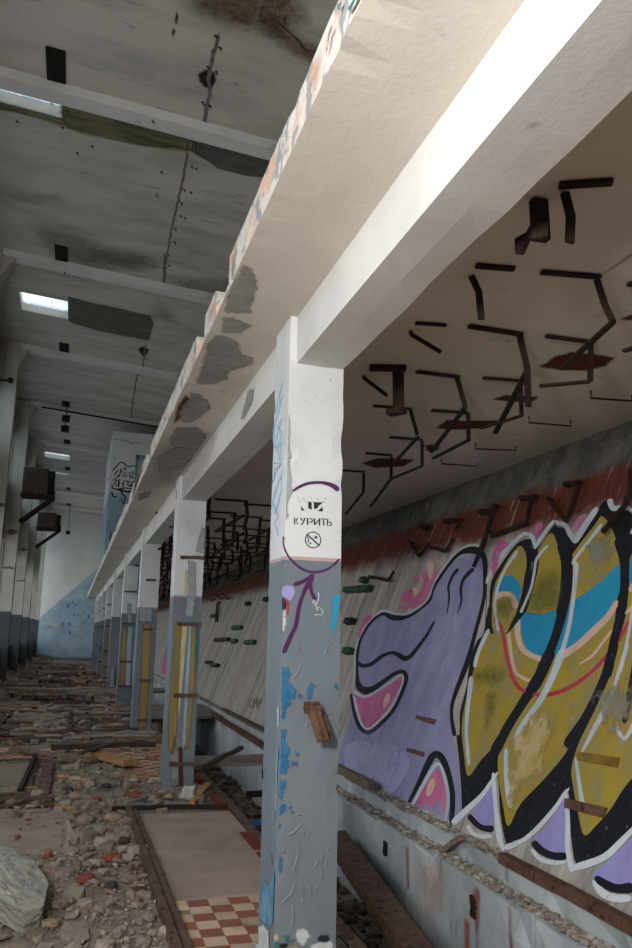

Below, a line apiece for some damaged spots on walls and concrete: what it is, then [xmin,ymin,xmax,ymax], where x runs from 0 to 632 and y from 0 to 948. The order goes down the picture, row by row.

crack [203,33,220,123]
crack [278,21,316,53]
crack [162,152,189,283]
crack [115,345,147,444]
flaking render [157,261,257,471]
peeling [263,667,315,828]
peeling [258,854,333,948]
rust [465,890,478,948]